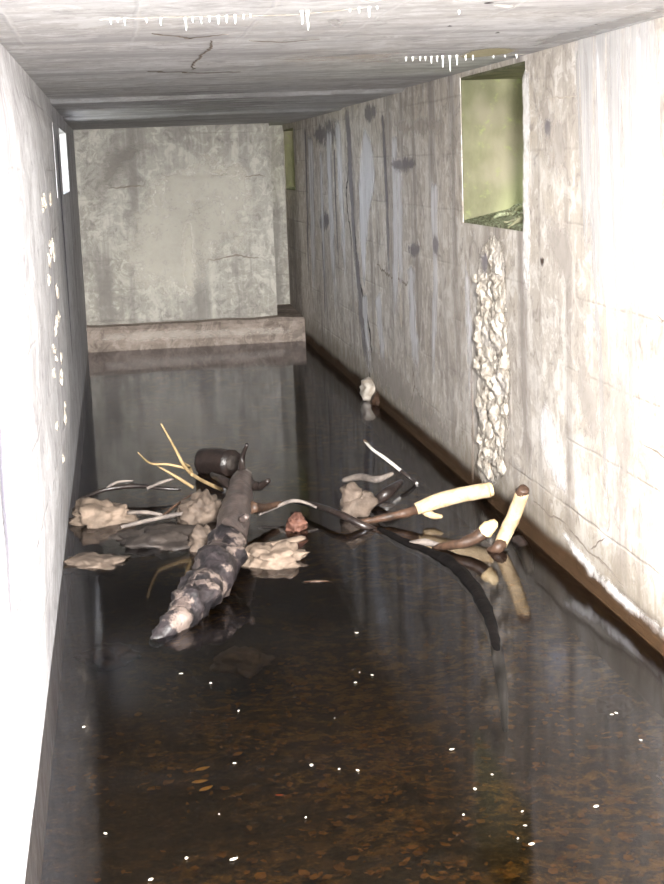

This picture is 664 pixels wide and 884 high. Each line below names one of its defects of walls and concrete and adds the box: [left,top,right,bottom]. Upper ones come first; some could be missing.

crack [100,7,366,74]
damp [304,120,345,304]
damp [359,105,420,370]
damp [535,9,664,487]
damp [307,338,361,394]
damp [374,392,482,486]
spalling [472,235,511,483]
damp [480,495,509,521]
damp [514,516,664,664]